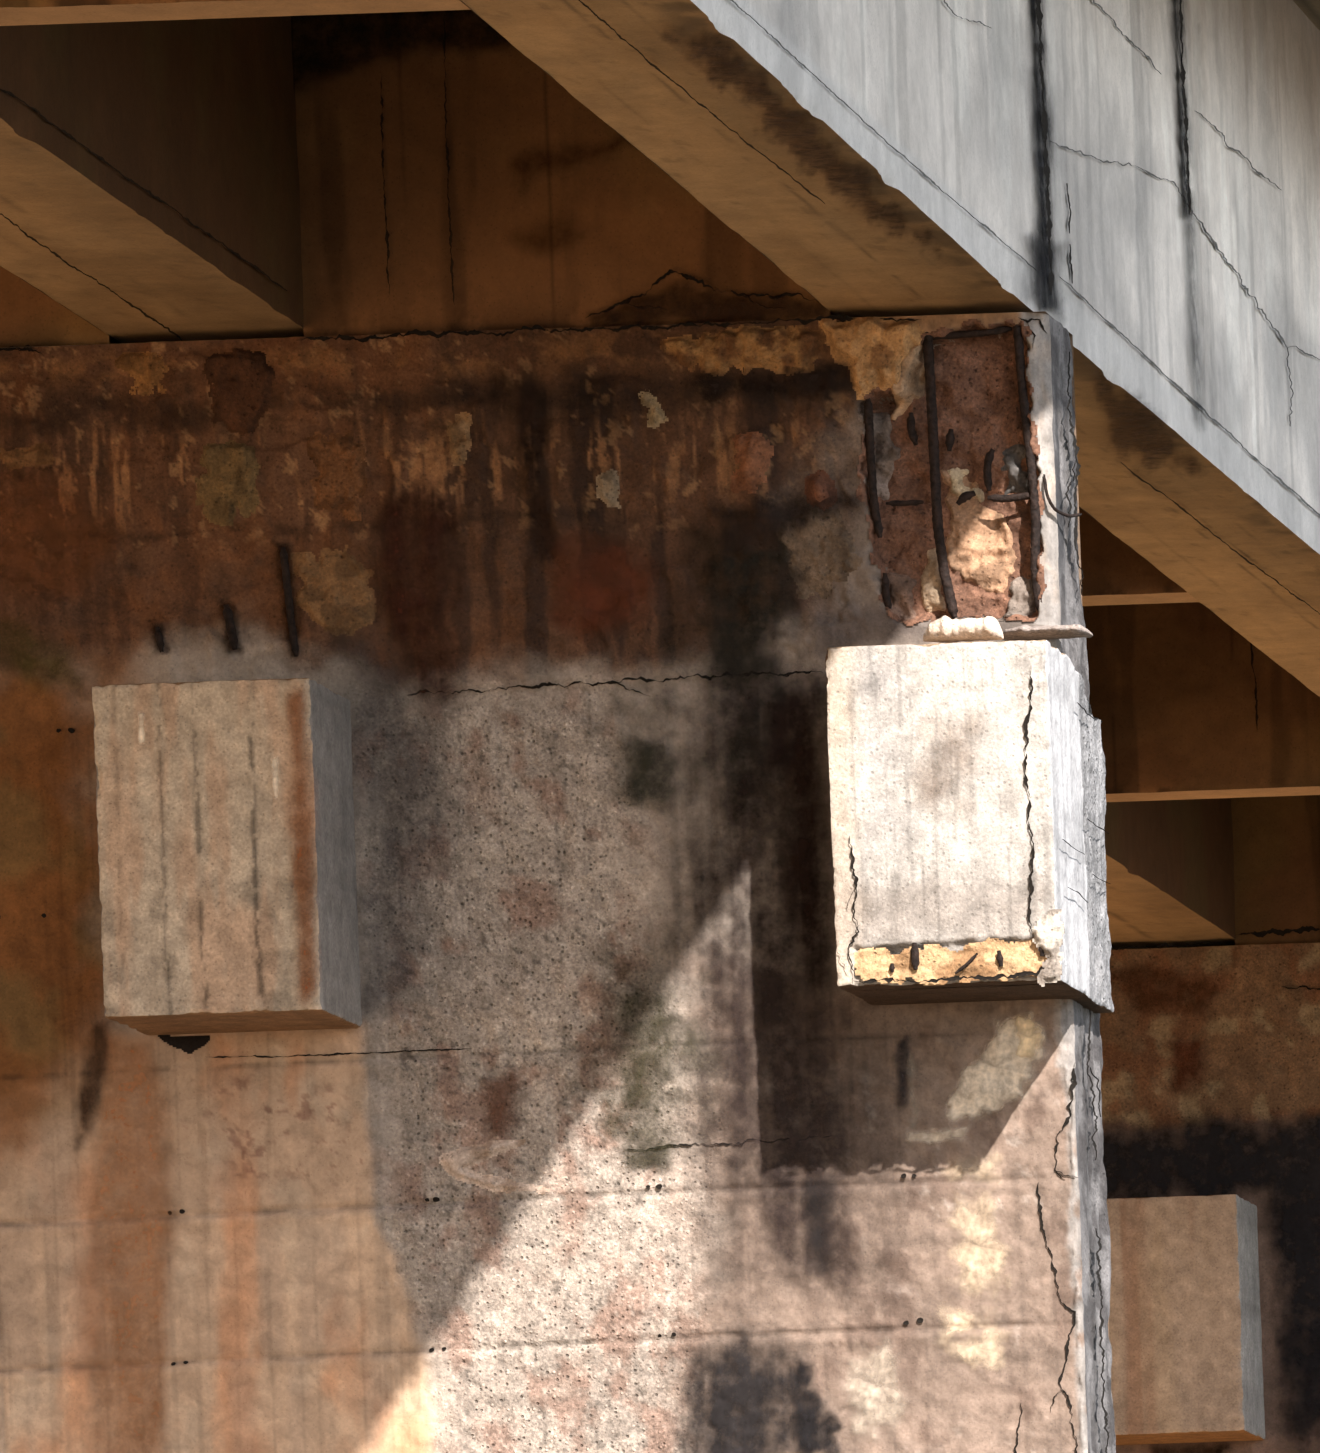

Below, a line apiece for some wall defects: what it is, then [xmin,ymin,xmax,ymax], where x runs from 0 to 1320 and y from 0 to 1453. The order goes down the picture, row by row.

crack [730,0,1320,516]
damp [1031,0,1062,317]
damp [1174,0,1202,422]
spalling [660,317,1082,626]
crack [1018,317,1084,595]
crack [407,670,821,696]
damp [691,496,871,1270]
crack [836,836,1043,984]
spalling [854,909,1064,987]
crack [1023,669,1110,932]
crack [1014,1010,1109,1453]
damp [683,1332,901,1453]